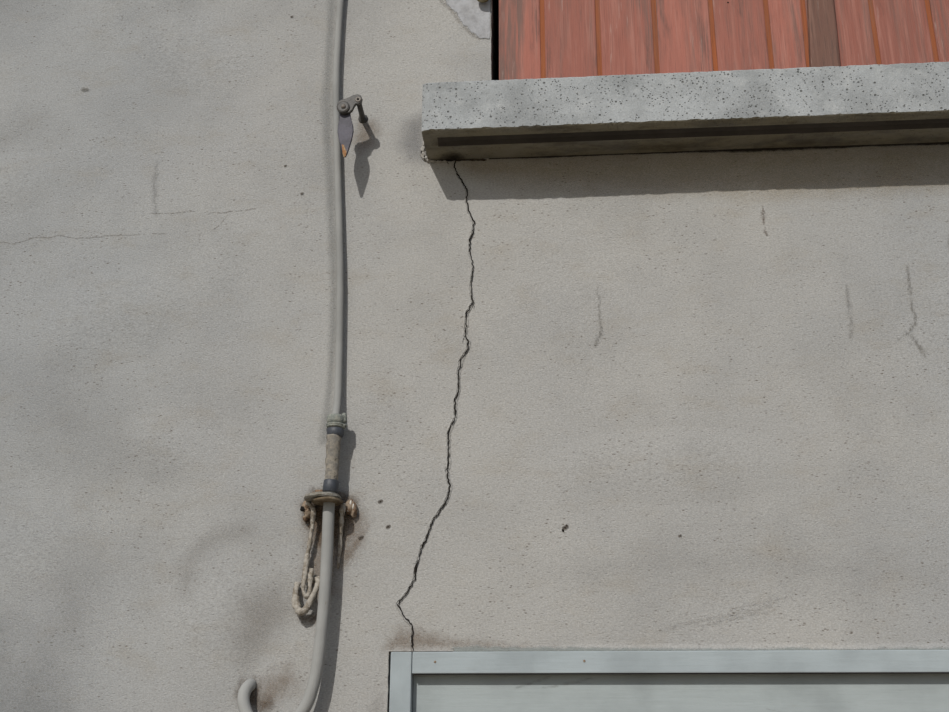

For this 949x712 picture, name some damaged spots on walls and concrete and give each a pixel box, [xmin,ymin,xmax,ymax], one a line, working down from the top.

peeling [444,0,490,38]
crack [395,155,487,651]